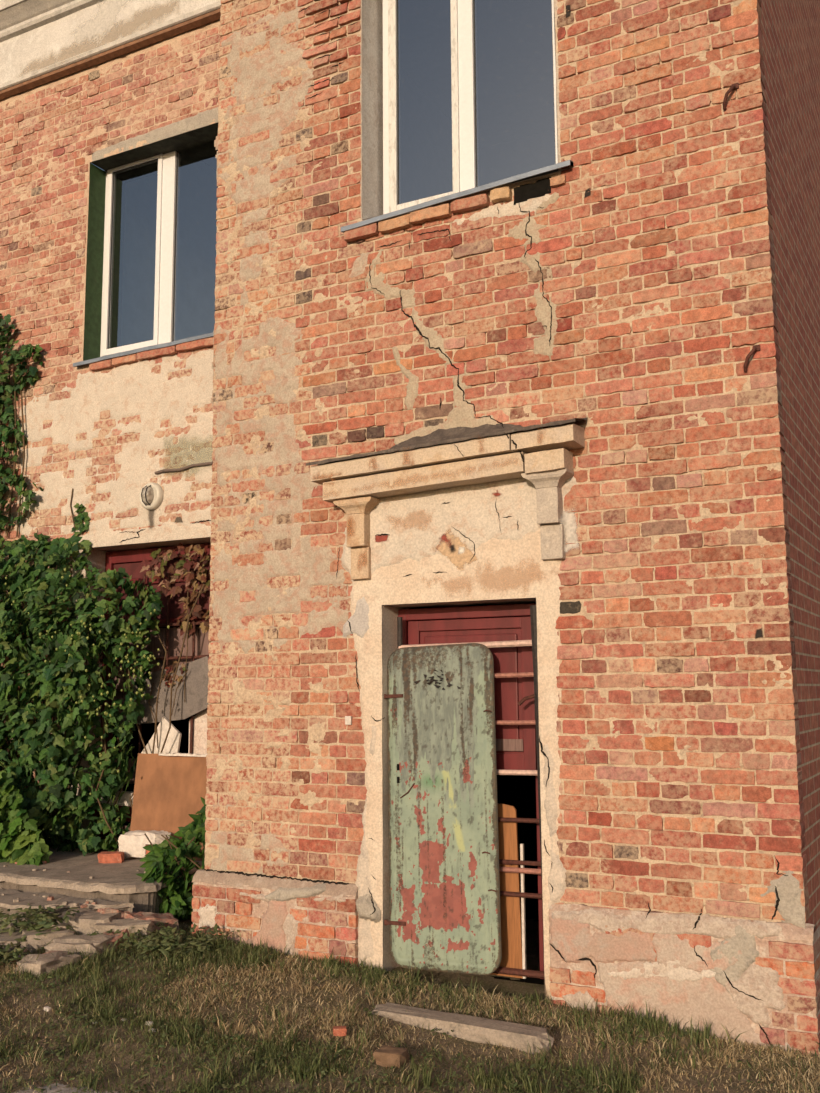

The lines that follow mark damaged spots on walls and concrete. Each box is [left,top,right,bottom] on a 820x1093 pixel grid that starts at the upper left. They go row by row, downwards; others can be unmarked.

crack [299,2,359,99]
peeling [214,0,314,310]
crack [497,192,562,360]
crack [365,229,525,463]
peeling [15,317,351,654]
flaking render [436,530,477,569]
peeling [216,901,288,954]
crack [549,943,597,978]
crack [693,909,772,1046]